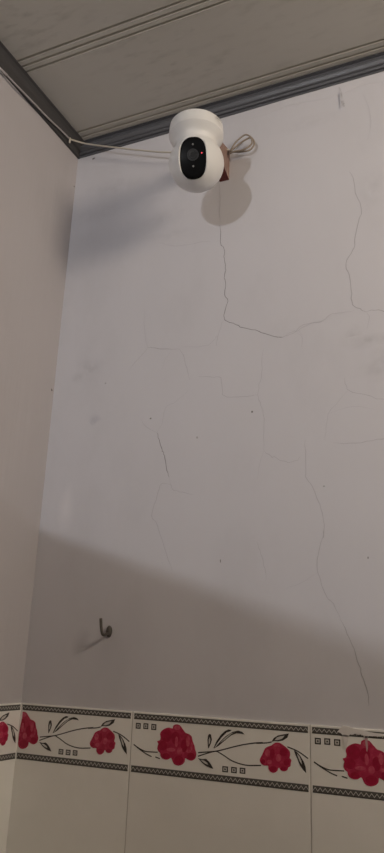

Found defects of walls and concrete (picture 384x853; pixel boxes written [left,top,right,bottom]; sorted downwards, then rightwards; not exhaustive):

crack [199,174,384,347]